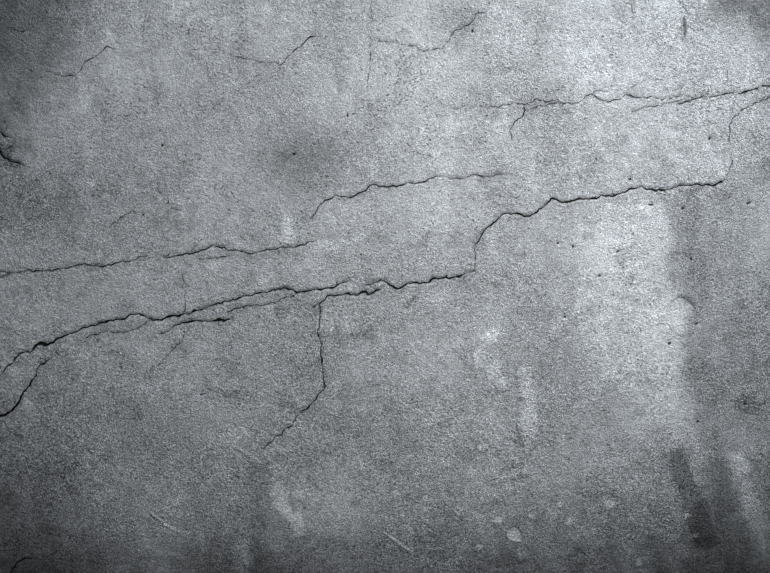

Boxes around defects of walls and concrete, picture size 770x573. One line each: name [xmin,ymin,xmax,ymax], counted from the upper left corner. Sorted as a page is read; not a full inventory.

crack [229,36,316,86]
crack [367,6,485,87]
crack [0,71,770,449]